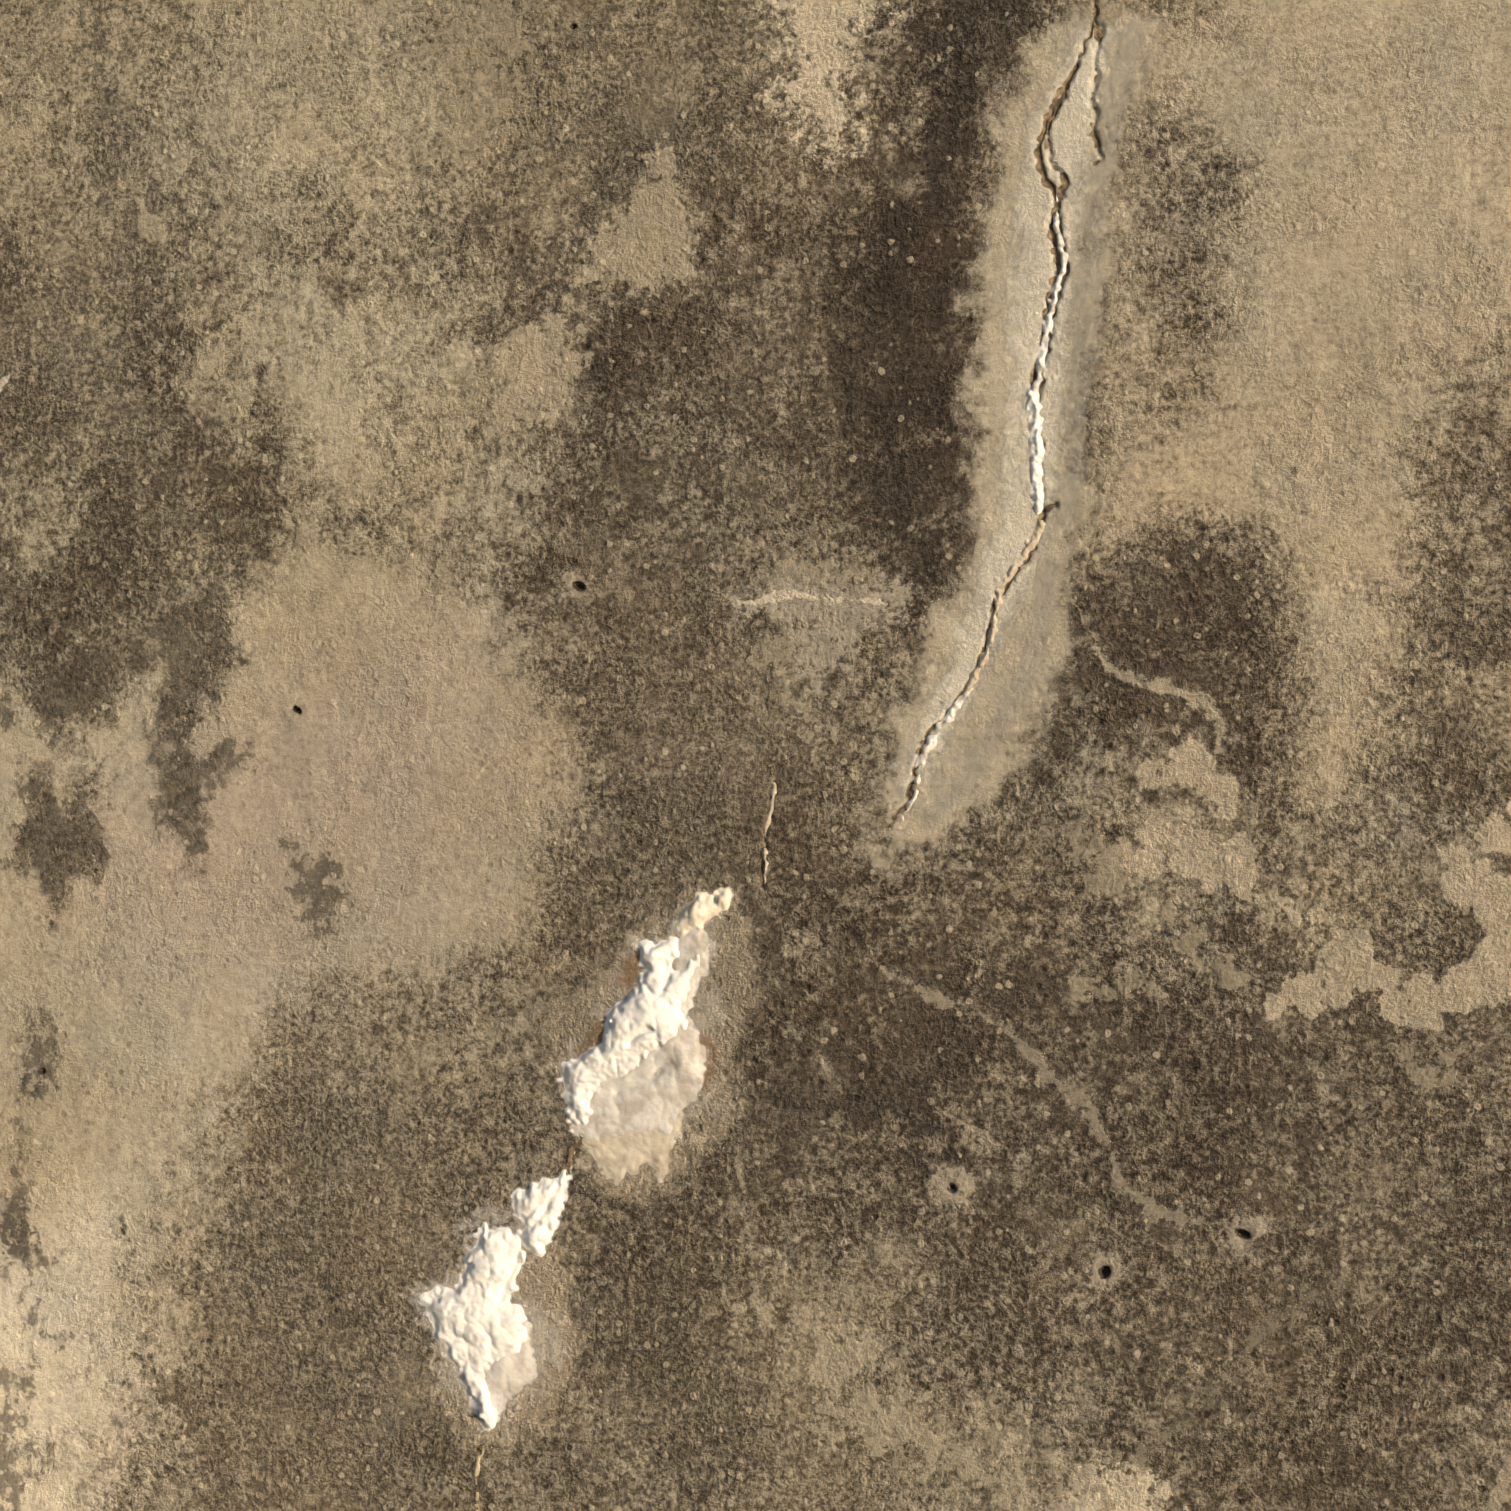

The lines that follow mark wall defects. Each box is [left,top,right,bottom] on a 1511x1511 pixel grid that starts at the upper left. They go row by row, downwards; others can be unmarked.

crack [885,0,1103,830]
crack [759,779,781,884]
damp [417,868,768,1454]
crack [474,1445,485,1511]